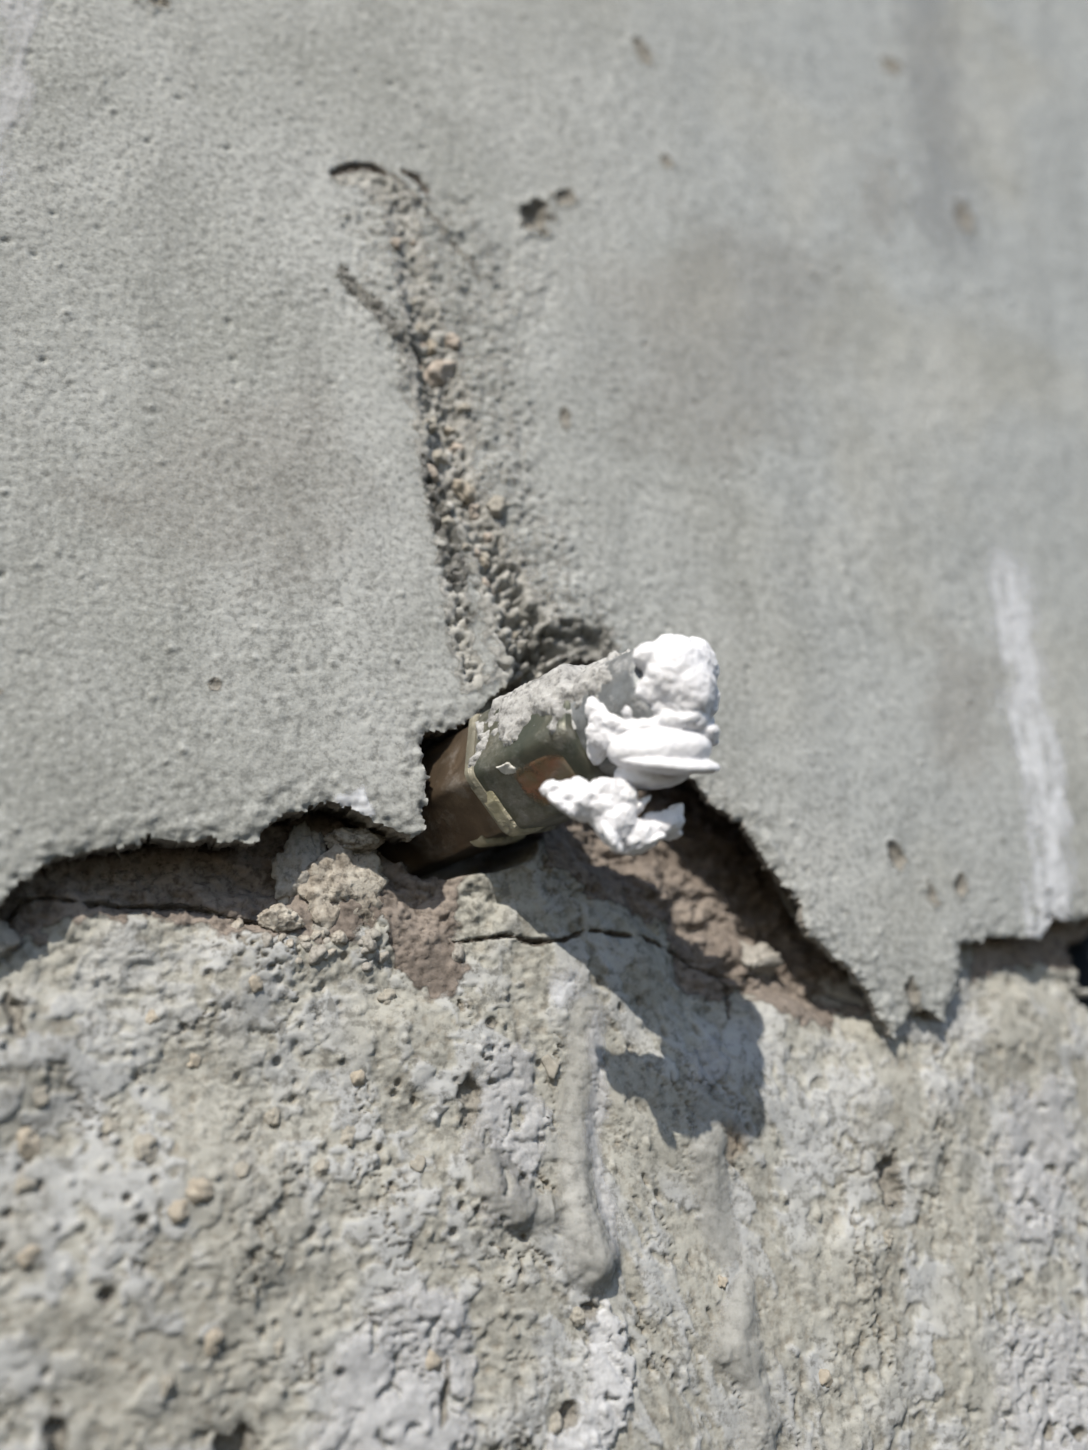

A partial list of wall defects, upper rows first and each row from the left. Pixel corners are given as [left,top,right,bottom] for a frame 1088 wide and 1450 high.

crack [329,162,482,280]
crack [5,896,258,925]
spalling [0,800,470,999]
spalling [493,777,897,1038]
crack [449,929,761,1019]
spalling [959,917,1088,982]
hole [457,1063,481,1128]
hole [874,1150,906,1210]
hole [41,1401,67,1450]
hole [213,1423,261,1450]
spalling [439,1360,450,1427]
spalling [559,1400,578,1428]